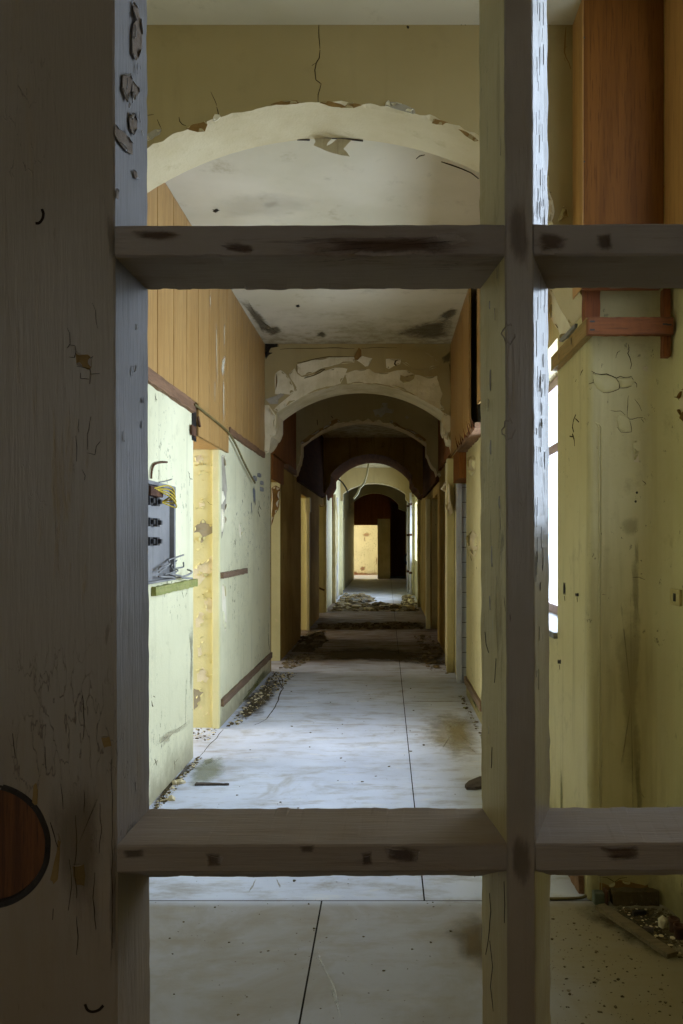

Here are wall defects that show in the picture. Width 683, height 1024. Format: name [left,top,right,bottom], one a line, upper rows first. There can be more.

peeling [132,1,143,60]
crack [313,26,321,97]
peeling [115,73,140,155]
spalling [186,114,221,132]
peeling [432,119,478,142]
spalling [265,348,451,454]
crack [575,344,644,433]
peeling [193,455,243,632]
peeling [193,636,212,715]